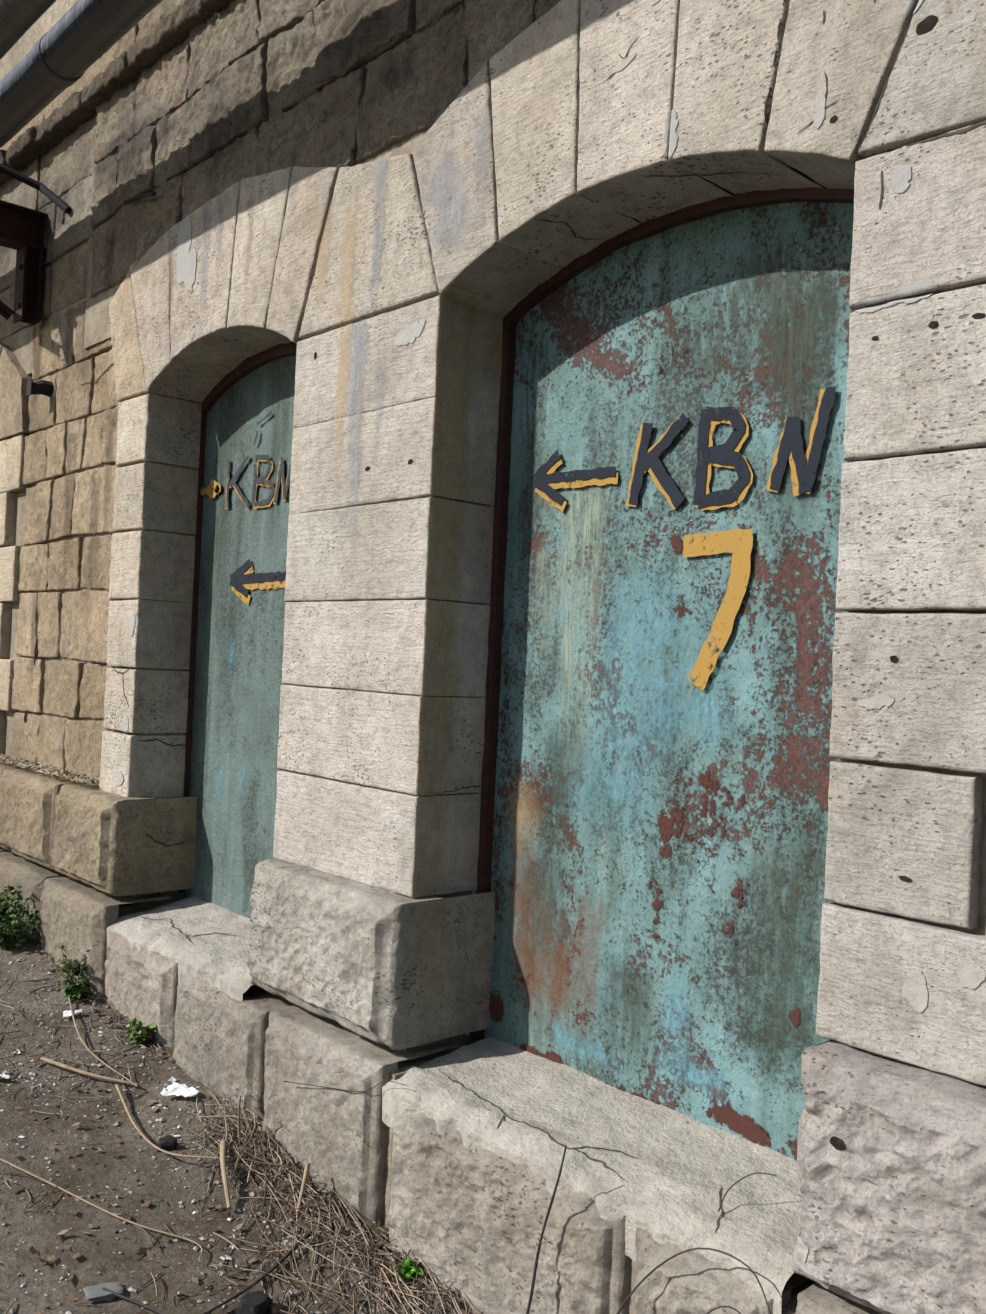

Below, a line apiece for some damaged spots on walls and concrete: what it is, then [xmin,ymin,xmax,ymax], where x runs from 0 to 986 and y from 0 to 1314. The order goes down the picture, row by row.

crack [140,916,237,943]
crack [438,1069,636,1181]